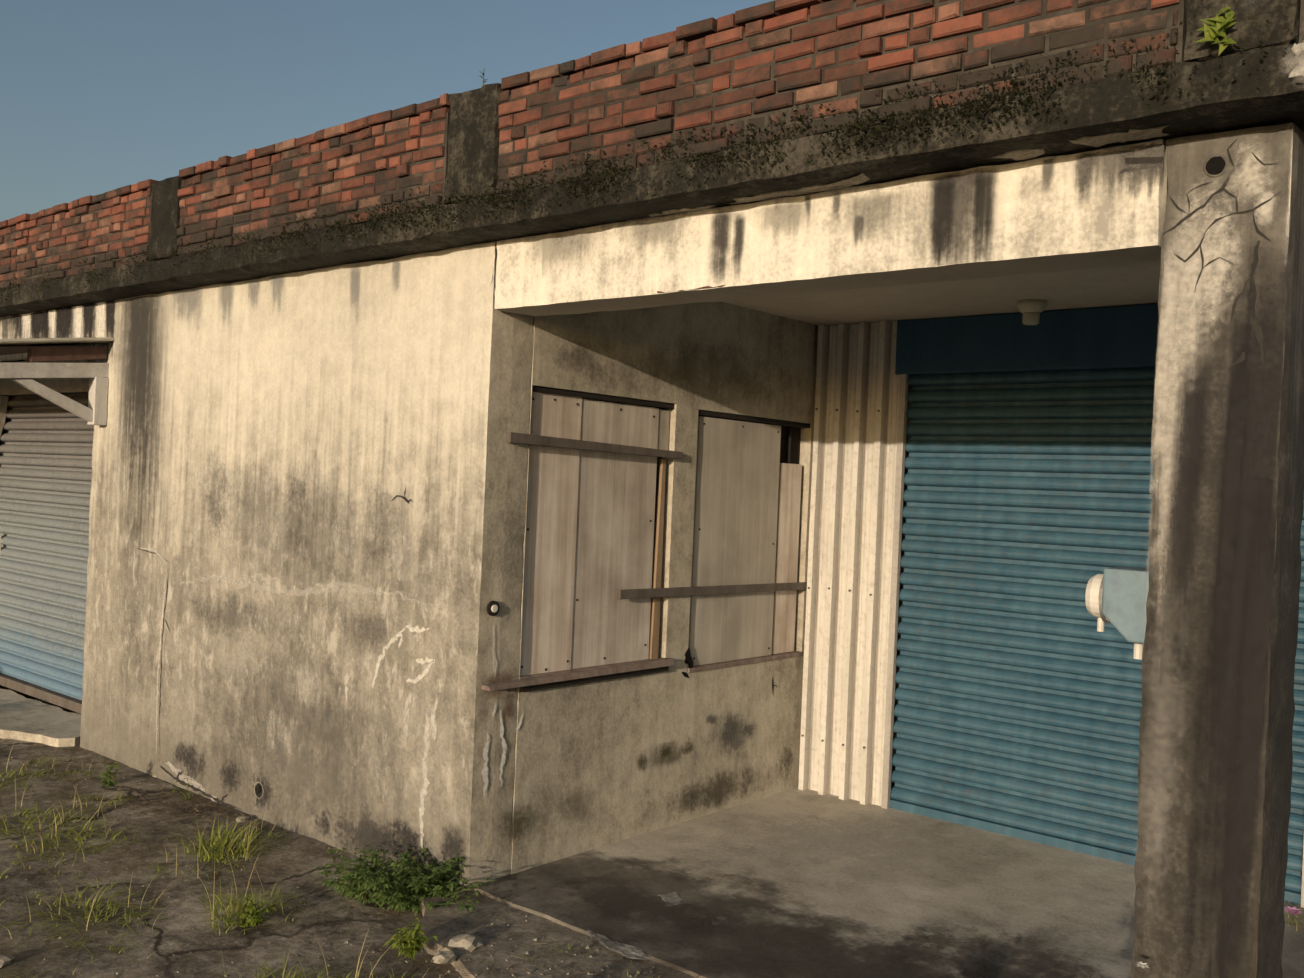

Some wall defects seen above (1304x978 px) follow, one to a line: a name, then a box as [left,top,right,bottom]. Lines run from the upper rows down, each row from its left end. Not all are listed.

spalling [1288,43,1304,78]
spalling [1069,125,1169,147]
spalling [992,148,1045,161]
crack [1119,157,1164,173]
water stain [931,171,992,260]
water stain [713,213,744,275]
crack [1160,139,1280,371]
water stain [176,745,203,776]
water stain [492,702,523,786]
water stain [707,716,752,749]
water stain [316,700,438,863]
water stain [683,774,752,807]